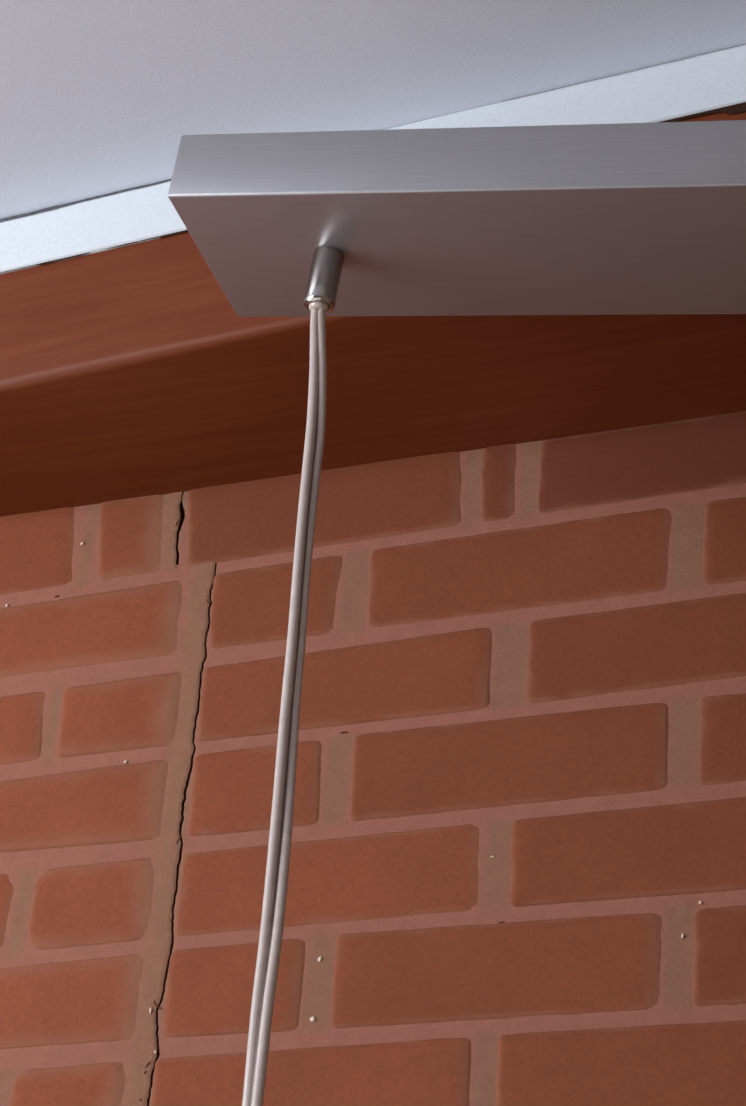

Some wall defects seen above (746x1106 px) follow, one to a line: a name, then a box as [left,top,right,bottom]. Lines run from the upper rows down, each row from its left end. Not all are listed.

crack [176,502,185,567]
crack [145,563,216,1106]